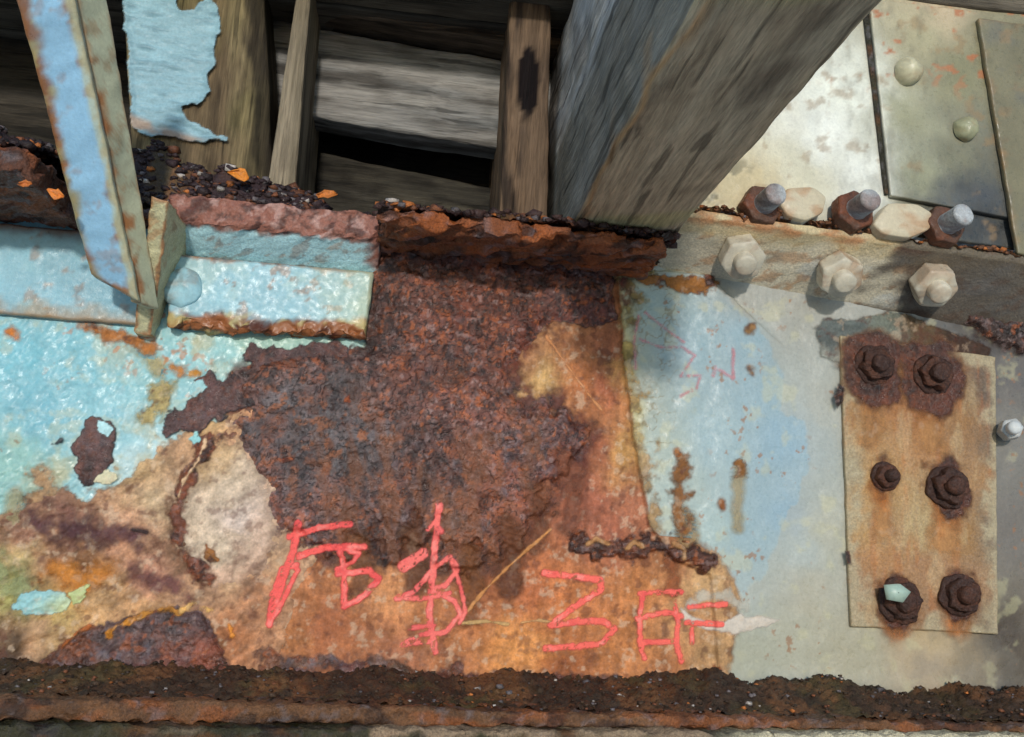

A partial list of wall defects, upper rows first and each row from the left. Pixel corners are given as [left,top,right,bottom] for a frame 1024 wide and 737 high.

peeling [122,0,228,142]
peeling [242,340,349,368]
peeling [162,370,256,444]
corrosion [840,328,967,472]
peeling [55,416,117,486]
corrosion [0,252,741,679]
corrosion [931,492,972,552]
peeling [68,584,90,604]
corrosion [876,573,912,638]